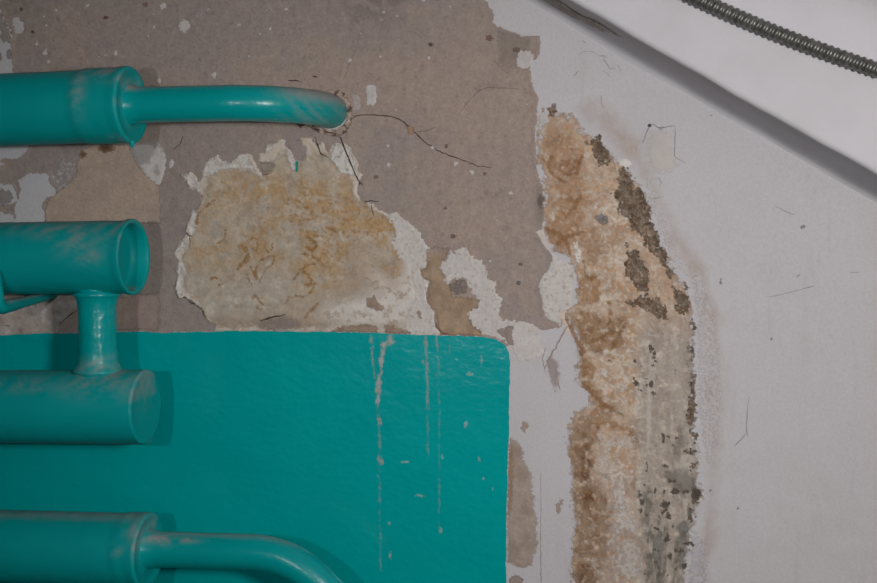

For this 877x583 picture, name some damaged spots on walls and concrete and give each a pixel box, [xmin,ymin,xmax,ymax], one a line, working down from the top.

peeling [0,0,576,363]
crack [314,114,491,216]
peeling [506,439,538,583]
damp [537,108,722,583]